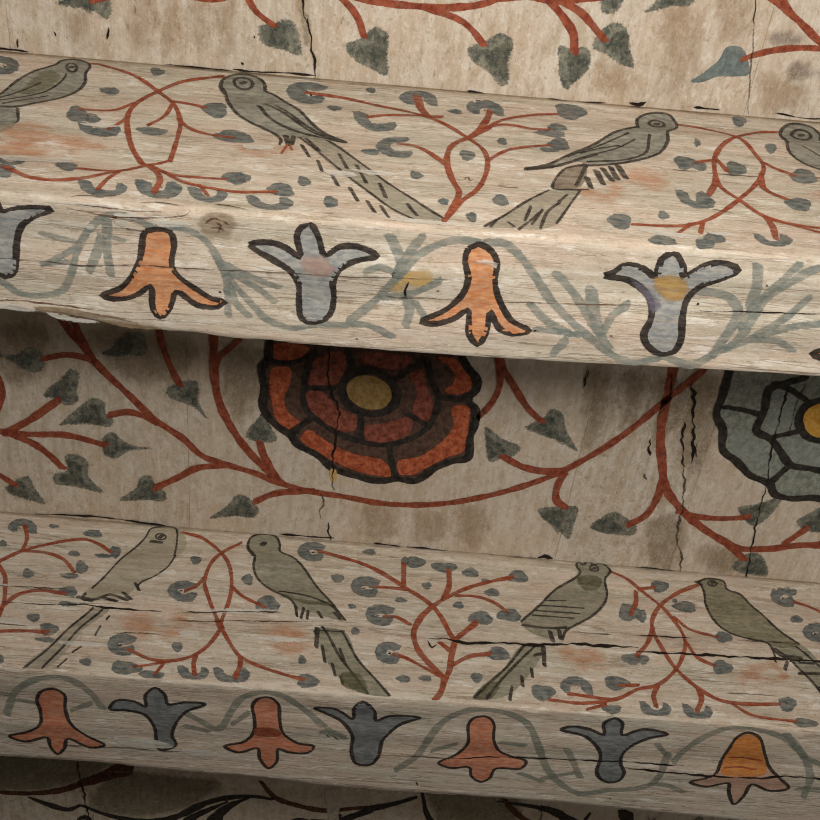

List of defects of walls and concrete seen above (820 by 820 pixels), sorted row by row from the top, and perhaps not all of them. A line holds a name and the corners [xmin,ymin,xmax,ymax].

crack [167,0,317,76]
crack [629,100,646,108]
crack [281,347,341,540]
crack [637,375,697,571]
crack [745,383,806,577]
crack [35,513,166,526]
crack [374,542,444,551]
crack [425,632,820,663]
crack [68,745,179,817]